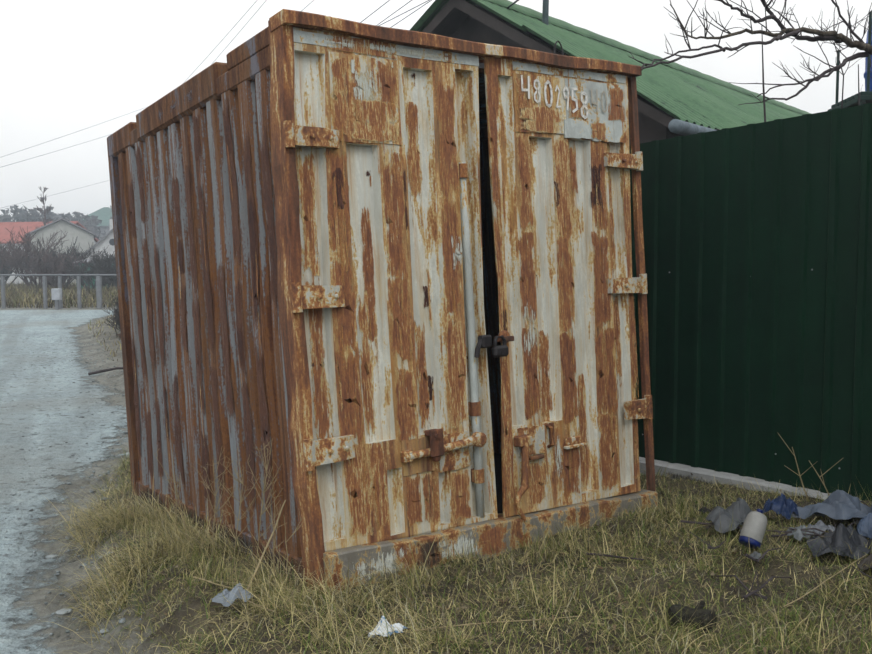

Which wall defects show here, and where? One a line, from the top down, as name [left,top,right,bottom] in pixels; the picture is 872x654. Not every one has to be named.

peeling [351,60,377,103]
peeling [325,37,455,68]
rust [128,146,185,489]
rust [298,153,320,285]
rust [306,35,439,537]
rust [435,81,468,434]
peeling [451,236,463,268]
rust [487,60,507,332]
peeling [524,303,539,355]
rust [452,469,471,521]
rust [500,356,516,505]
rust [529,455,549,507]